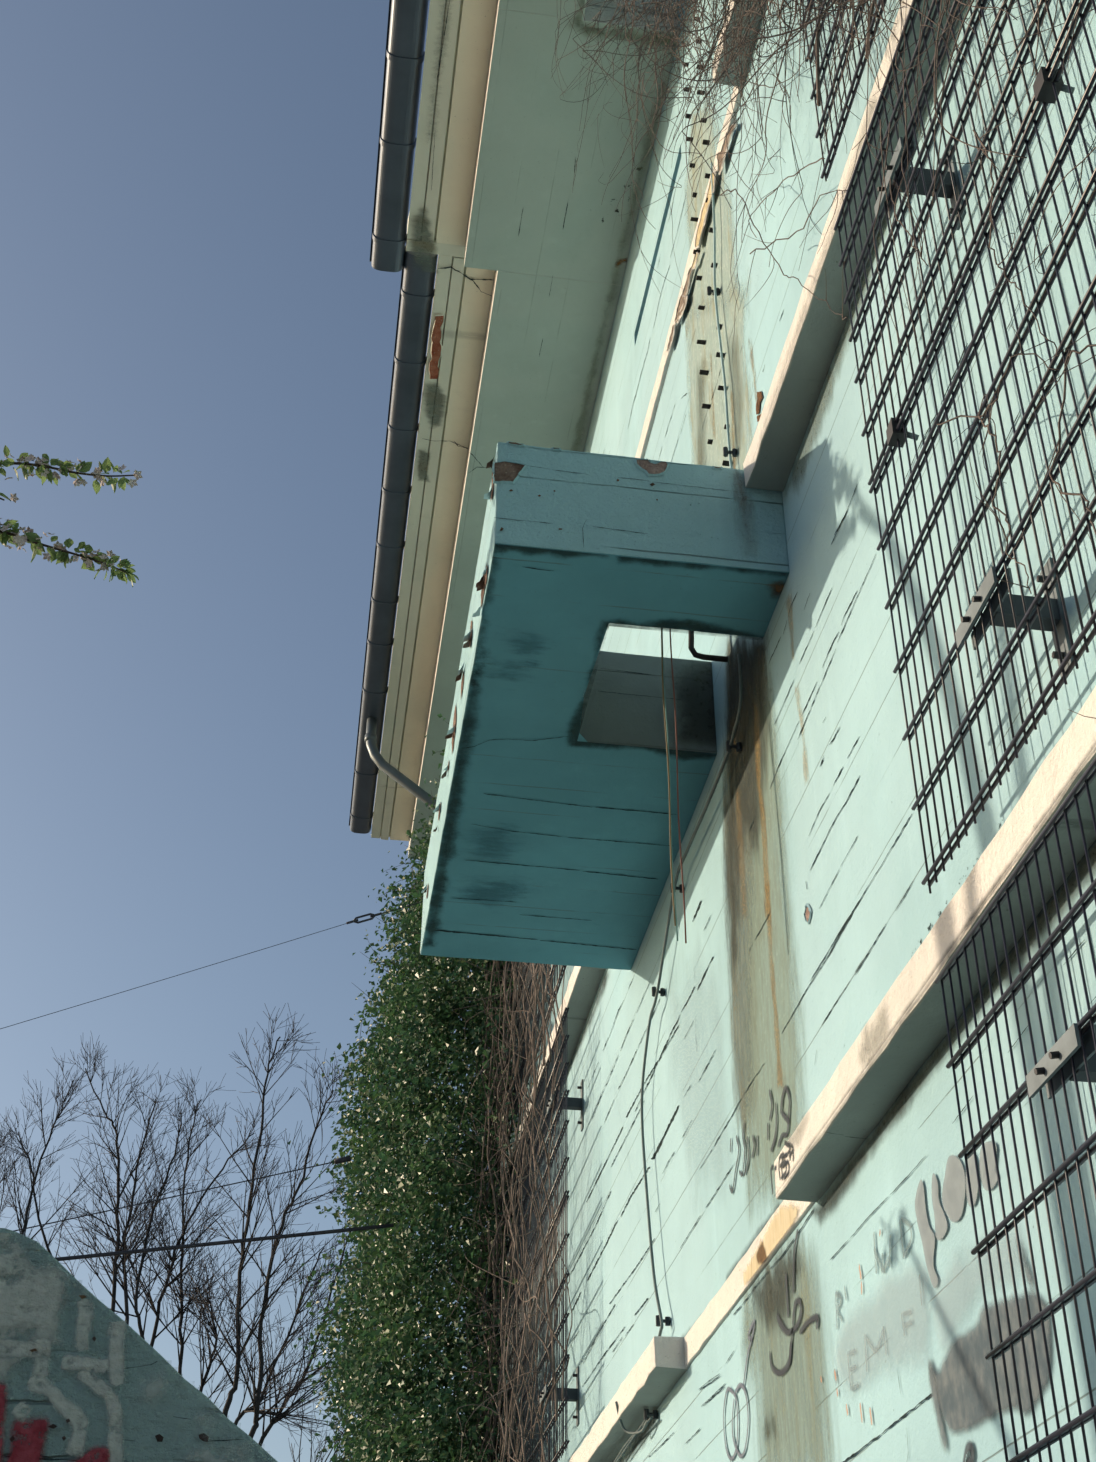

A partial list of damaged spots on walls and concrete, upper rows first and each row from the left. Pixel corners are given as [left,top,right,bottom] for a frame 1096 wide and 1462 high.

mould [412,209,436,272]
damp [687,109,751,470]
damp [569,620,816,1198]
damp [745,1209,829,1462]